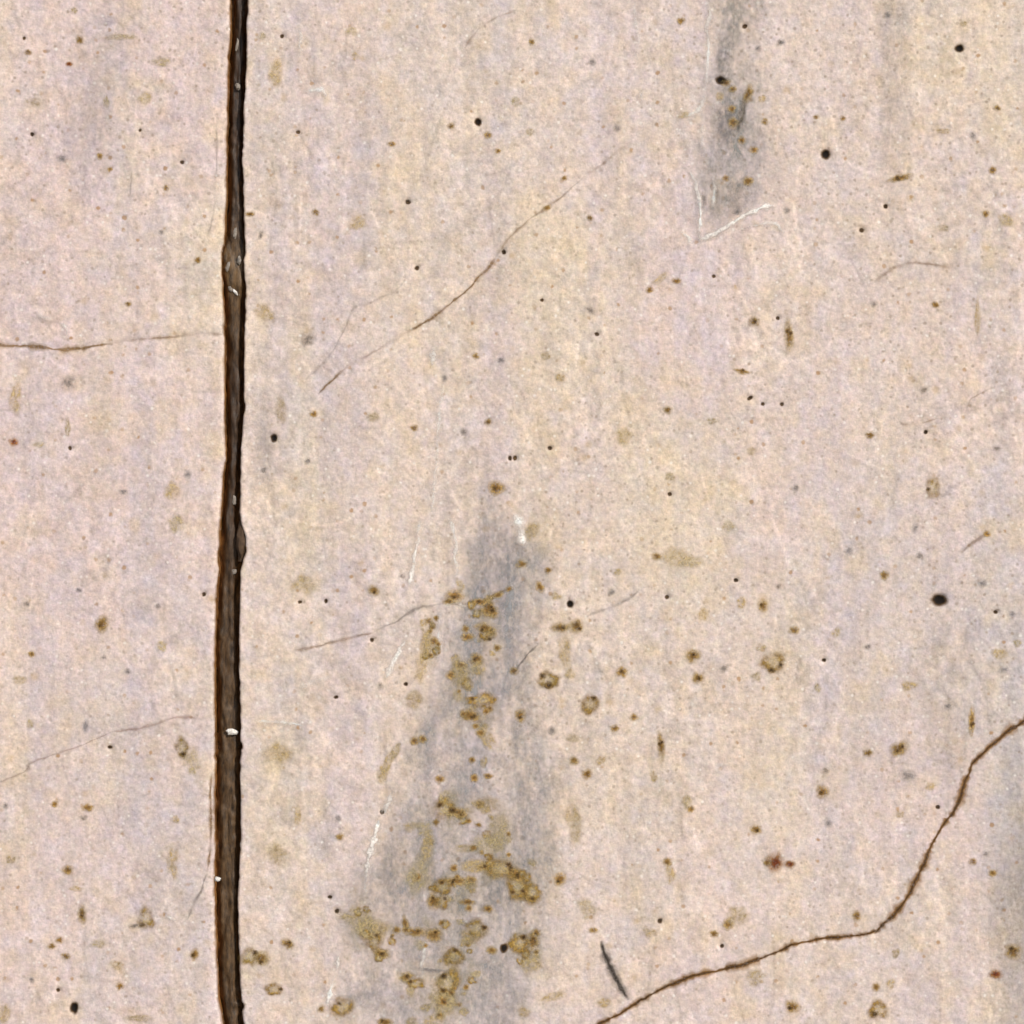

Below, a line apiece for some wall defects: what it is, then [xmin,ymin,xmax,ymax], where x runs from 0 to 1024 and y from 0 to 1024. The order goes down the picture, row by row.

leakage [716,76,765,158]
crack [413,261,494,329]
crack [597,720,1024,1024]